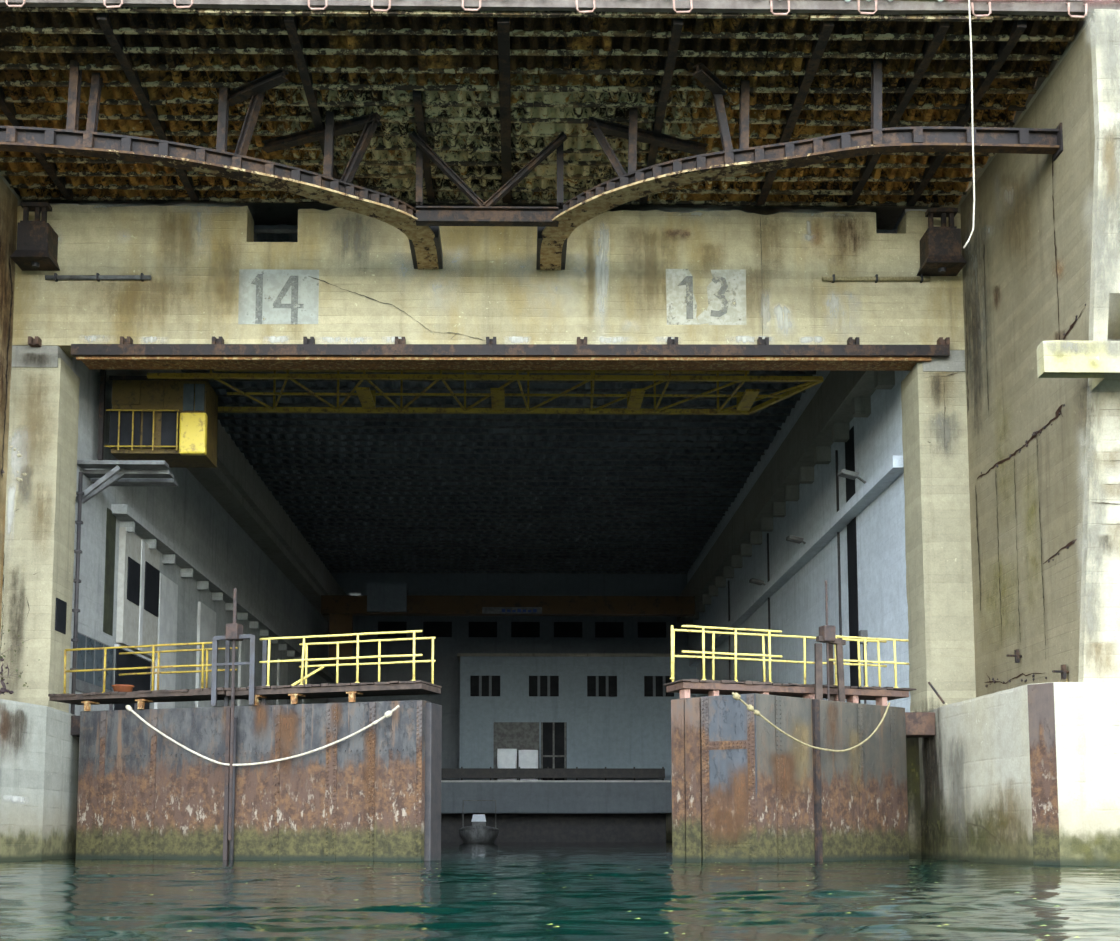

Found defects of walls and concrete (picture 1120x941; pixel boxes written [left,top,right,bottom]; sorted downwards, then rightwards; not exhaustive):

crack [309,276,486,341]